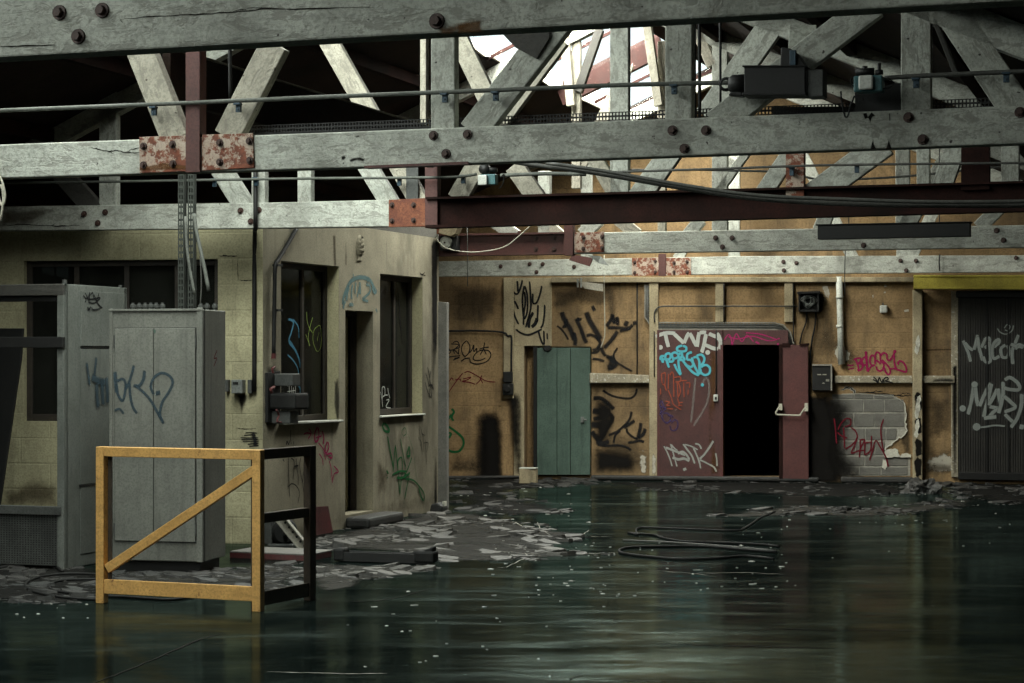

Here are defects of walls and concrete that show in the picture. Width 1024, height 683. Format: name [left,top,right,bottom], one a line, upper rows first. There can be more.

flaking render [832,392,922,477]